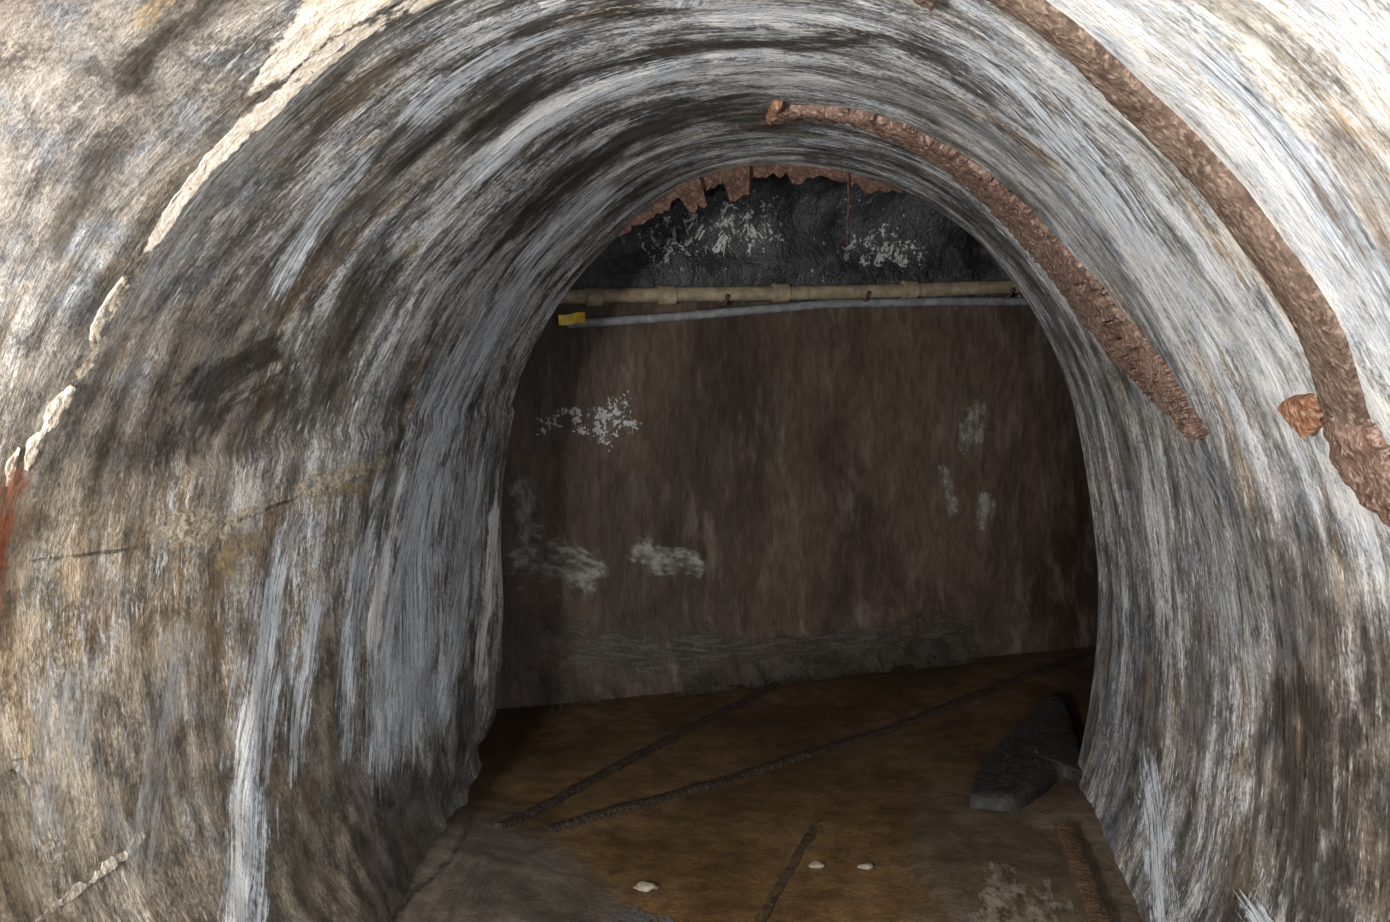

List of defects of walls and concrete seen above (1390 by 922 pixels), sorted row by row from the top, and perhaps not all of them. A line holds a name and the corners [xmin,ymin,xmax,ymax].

corrosion [0,458,33,629]
flaking render [5,277,133,483]
damp [155,238,395,465]
flaking render [144,0,438,278]
damp [392,10,576,131]
damp [217,87,762,922]
damp [457,31,889,190]
corrosion [618,165,902,237]
corrosion [766,101,1210,441]
peeling [1277,393,1326,438]